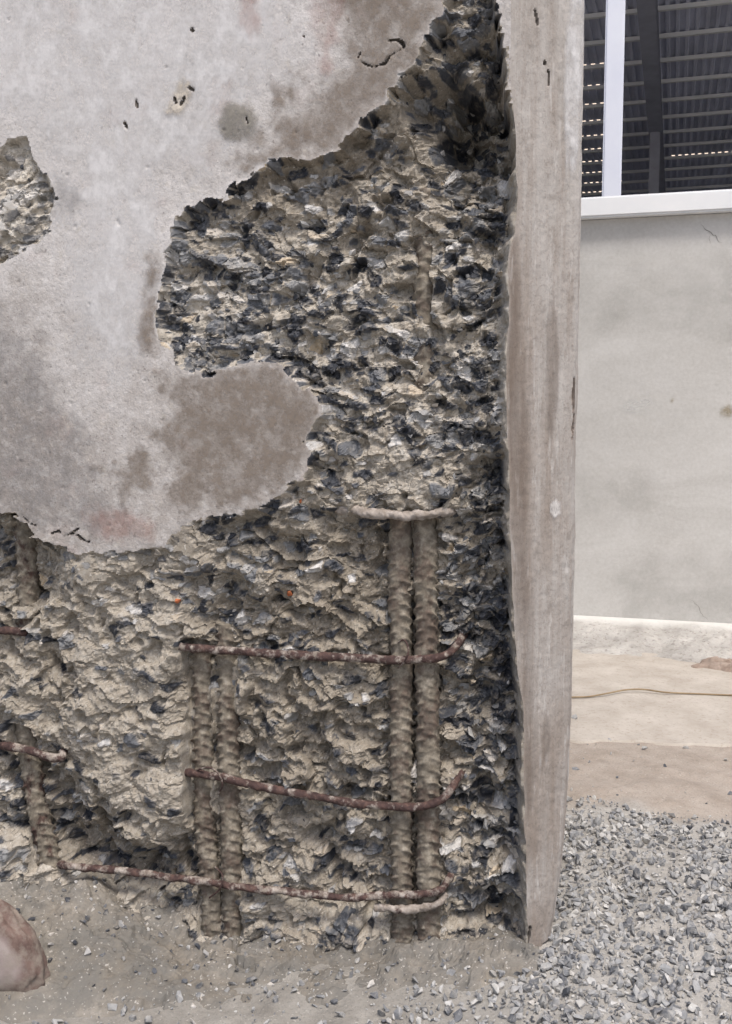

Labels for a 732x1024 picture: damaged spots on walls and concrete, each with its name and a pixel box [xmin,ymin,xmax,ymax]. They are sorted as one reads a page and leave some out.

leakage [0,0,283,356]
crack [357,38,406,68]
leakage [155,368,317,505]
spalling [0,0,528,953]